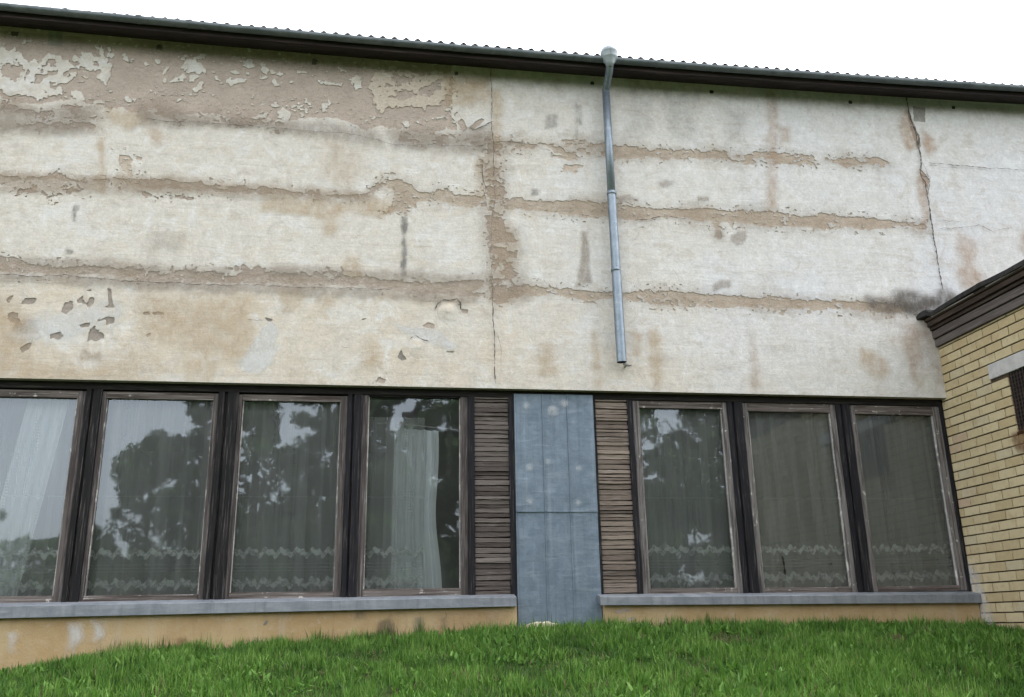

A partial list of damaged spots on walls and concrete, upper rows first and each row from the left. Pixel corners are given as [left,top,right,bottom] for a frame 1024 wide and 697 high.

peeling [0,26,929,342]